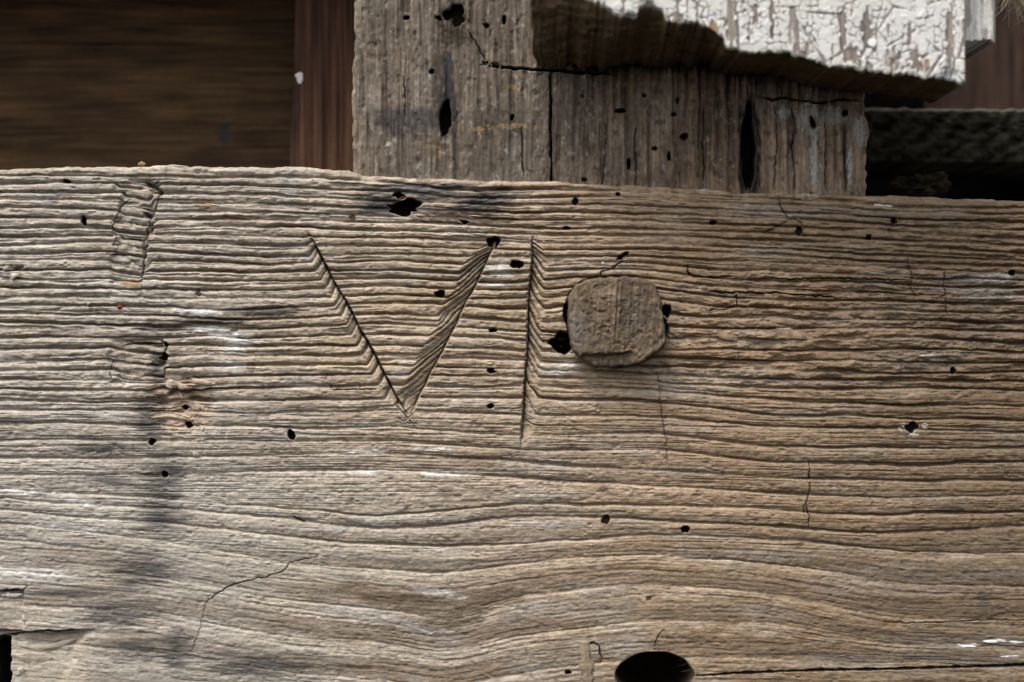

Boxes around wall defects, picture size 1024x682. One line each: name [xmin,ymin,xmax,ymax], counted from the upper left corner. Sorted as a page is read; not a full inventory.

peeling [670,12,687,22]
peeling [706,0,737,50]
peeling [751,0,776,40]
peeling [838,6,877,63]
peeling [910,51,921,71]
peeling [945,4,956,72]
crack [468,31,614,185]
crack [757,95,861,234]
crack [656,372,669,464]
crack [802,461,812,528]
crack [191,556,318,656]